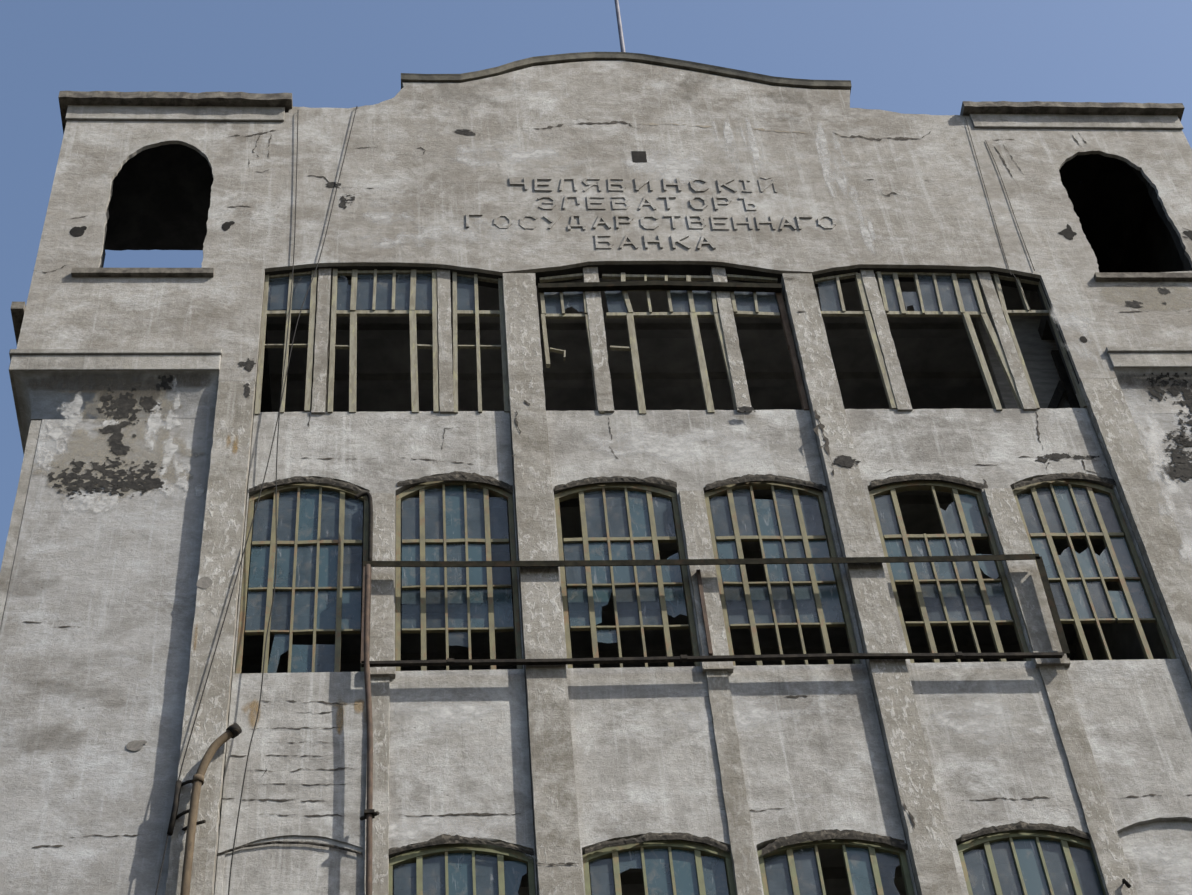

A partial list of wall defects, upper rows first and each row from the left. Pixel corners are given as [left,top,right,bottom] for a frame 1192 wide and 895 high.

flaking render [36,375,202,500]
spalling [1143,372,1192,482]